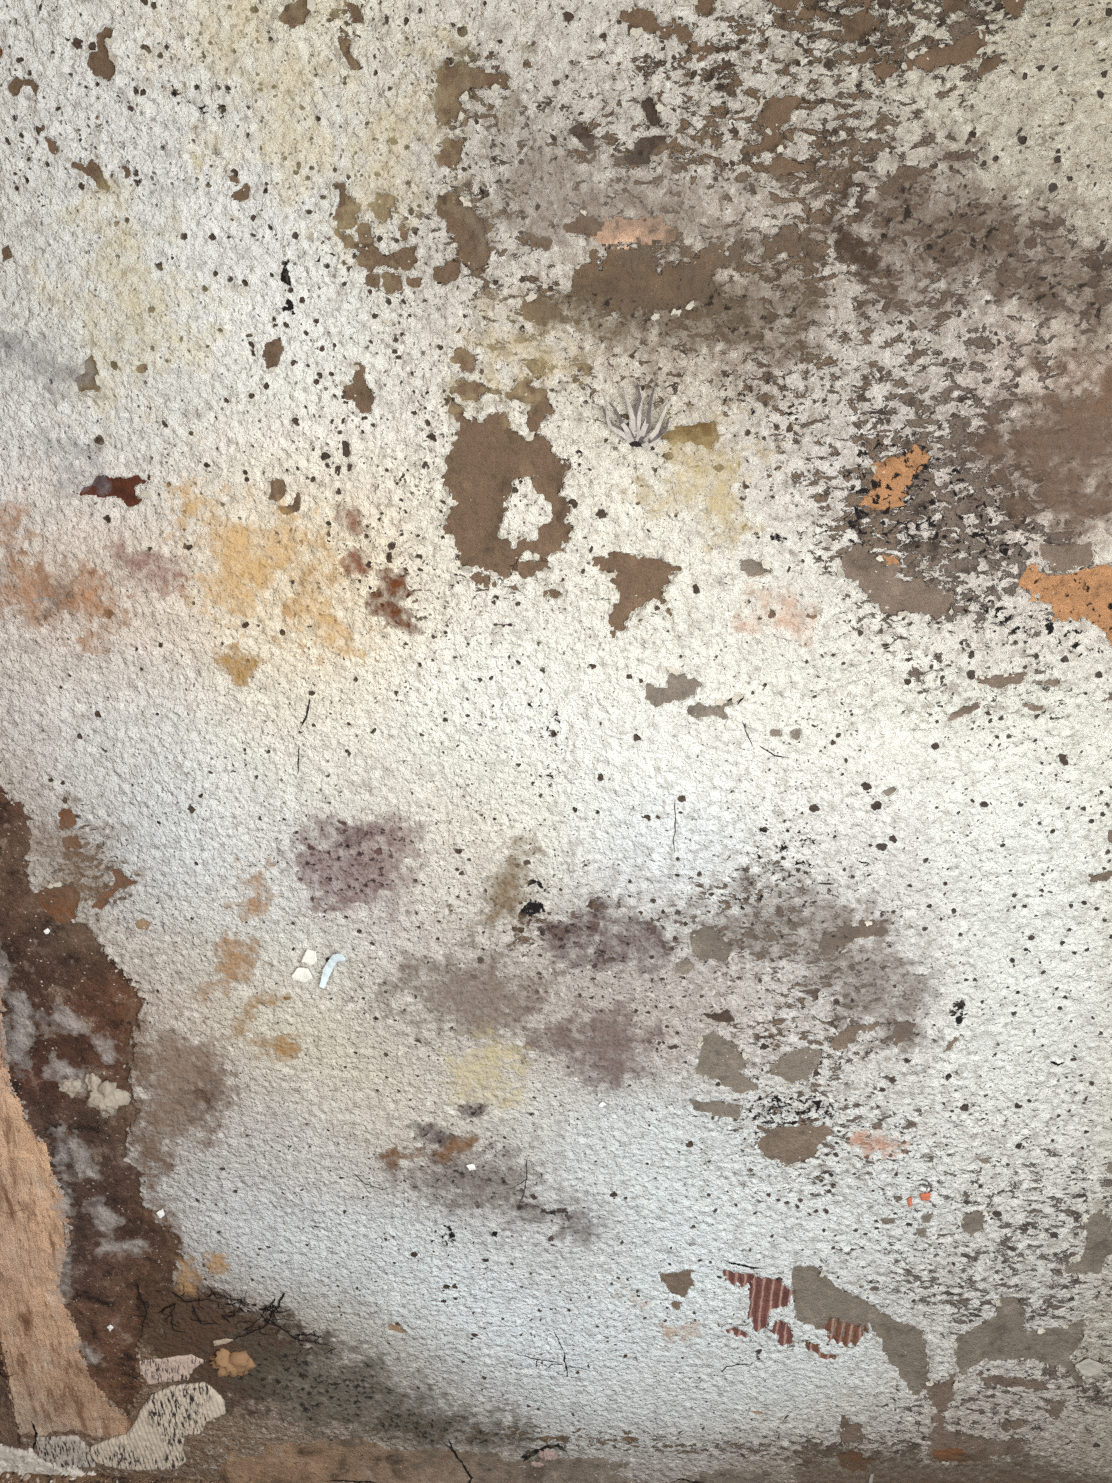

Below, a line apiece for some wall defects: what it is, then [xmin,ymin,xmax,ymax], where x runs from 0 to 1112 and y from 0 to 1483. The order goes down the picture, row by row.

peeling [321,182,495,294]
water stain [830,169,1112,339]
peeling [80,475,154,510]
peeling [441,347,573,588]
water stain [742,378,1112,560]
peeling [592,551,681,638]
water stain [962,573,1112,657]
peeling [1018,542,1112,646]
water stain [487,840,670,968]
water stain [0,786,544,1471]
water stain [747,1094,835,1127]
peeling [722,1265,1103,1466]